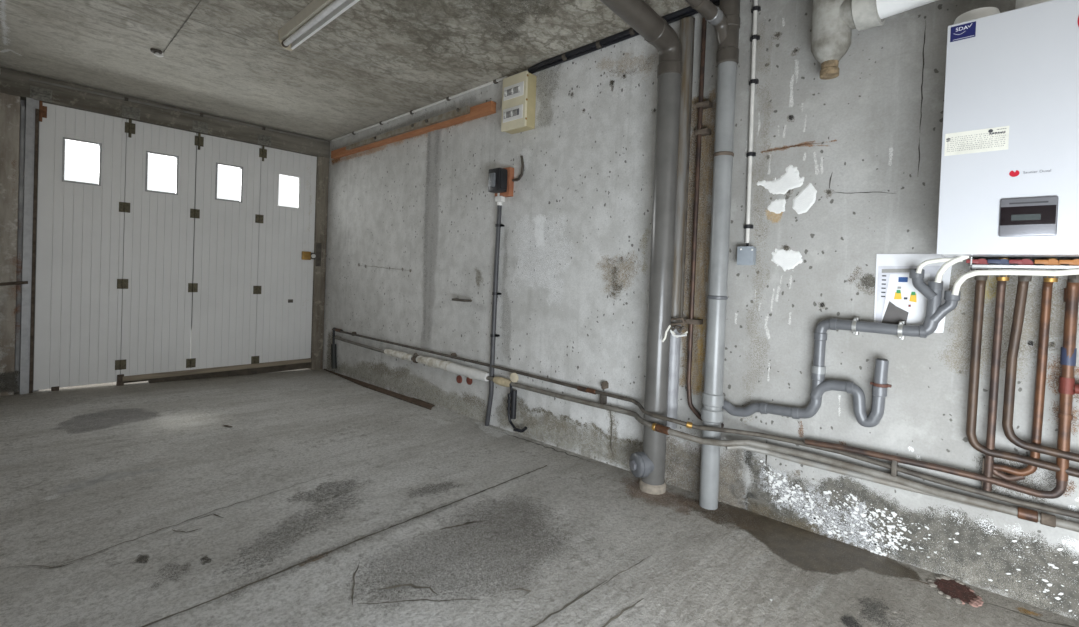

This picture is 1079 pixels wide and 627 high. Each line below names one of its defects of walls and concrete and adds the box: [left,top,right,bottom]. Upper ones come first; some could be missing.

leakage [372,0,570,59]
leakage [595,228,651,299]
leakage [54,408,161,434]
leakage [326,331,1079,621]
crack [141,404,620,627]
crack [532,555,652,627]